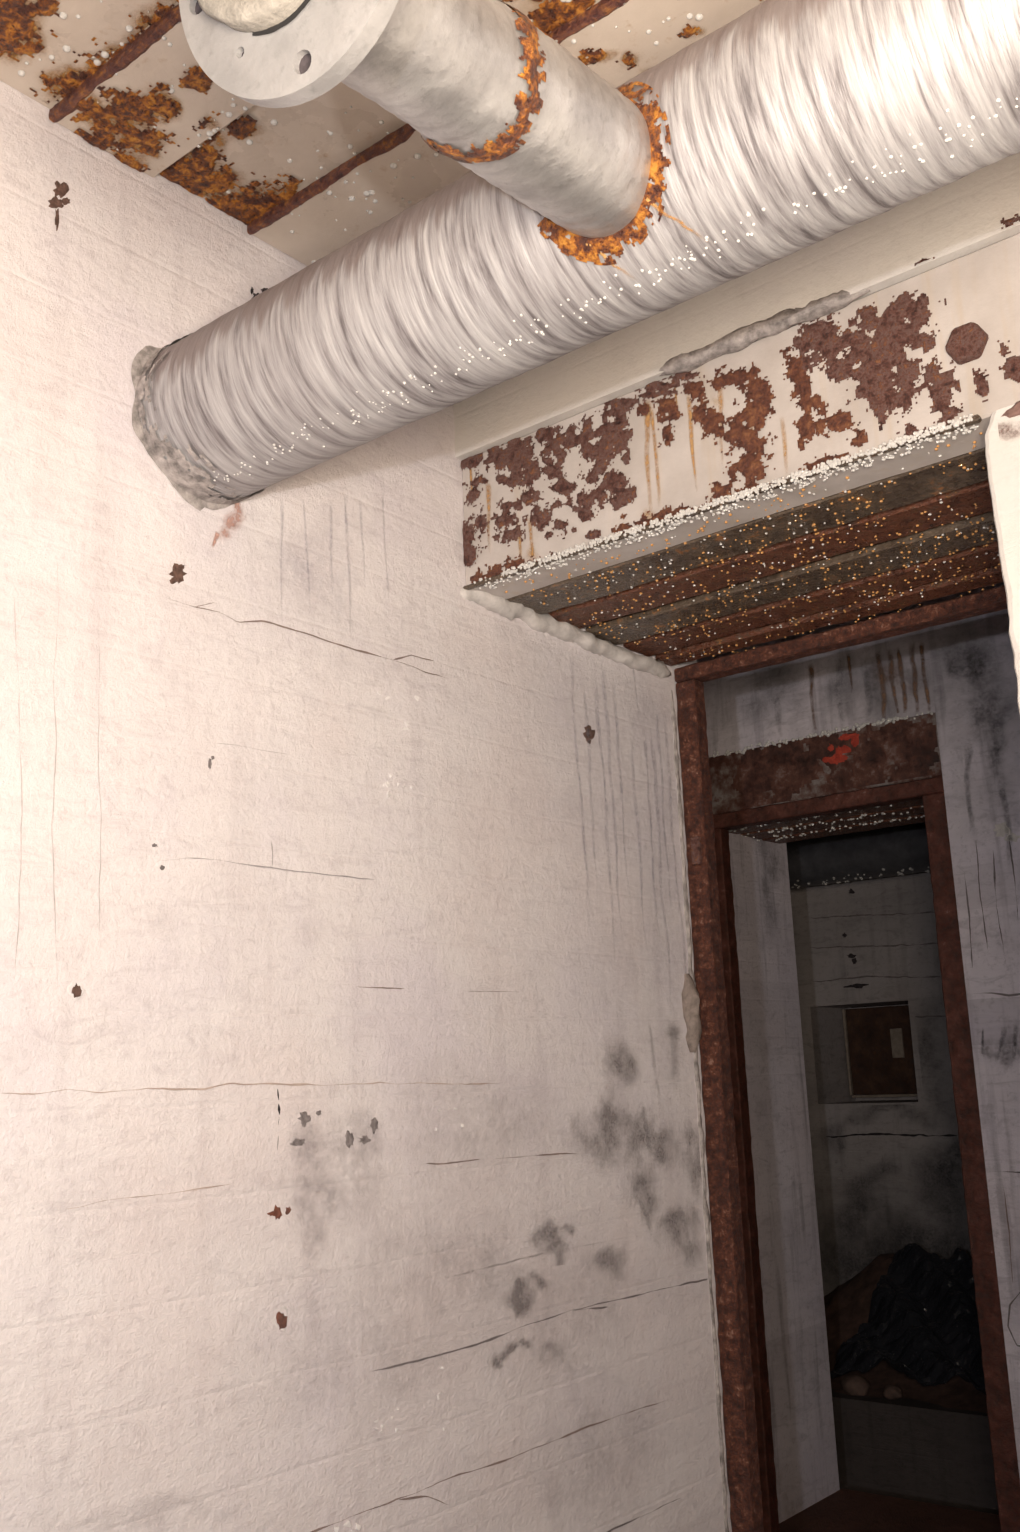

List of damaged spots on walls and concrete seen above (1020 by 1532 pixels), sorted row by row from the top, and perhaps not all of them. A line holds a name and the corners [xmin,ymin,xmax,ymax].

corrosion [677,24,702,38]
corrosion [0,0,692,270]
corrosion [1000,213,1020,229]
corrosion [461,290,1020,584]
corrosion [731,645,940,807]
leakage [594,1105,666,1162]
leakage [511,1278,544,1316]